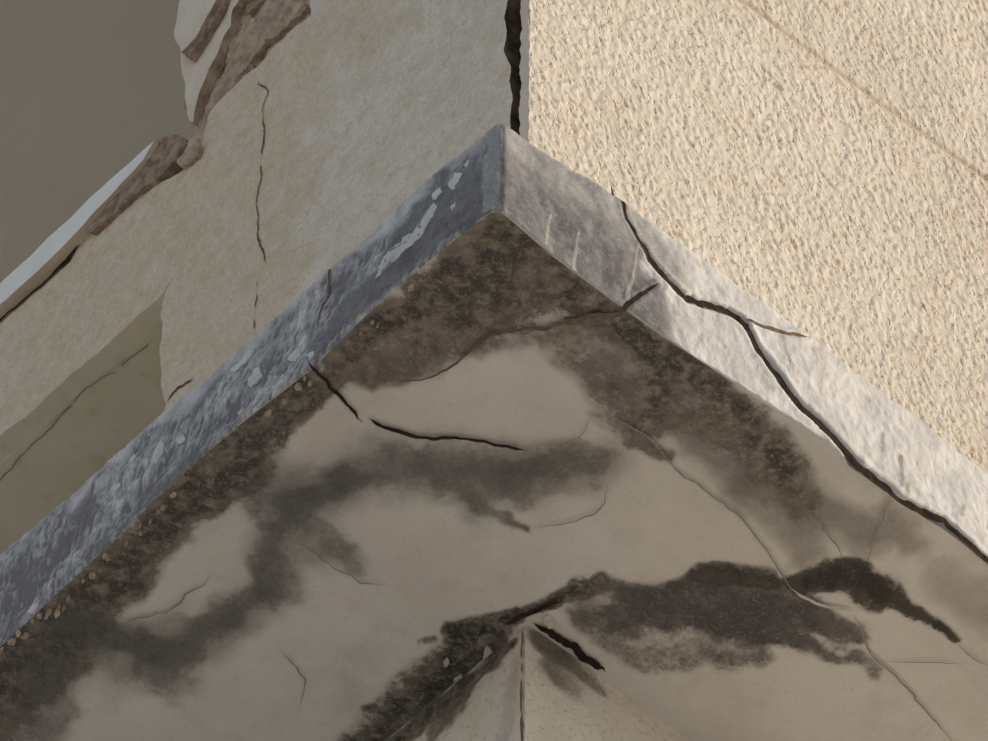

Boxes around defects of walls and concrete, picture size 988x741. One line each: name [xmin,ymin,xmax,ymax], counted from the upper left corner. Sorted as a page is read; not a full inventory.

spalling [85,0,311,236]
crack [253,83,269,327]
spalling [0,595,70,655]
peeling [150,434,186,464]
crack [280,649,306,704]
leakage [0,124,872,741]
crack [308,361,988,741]
crack [398,186,988,566]